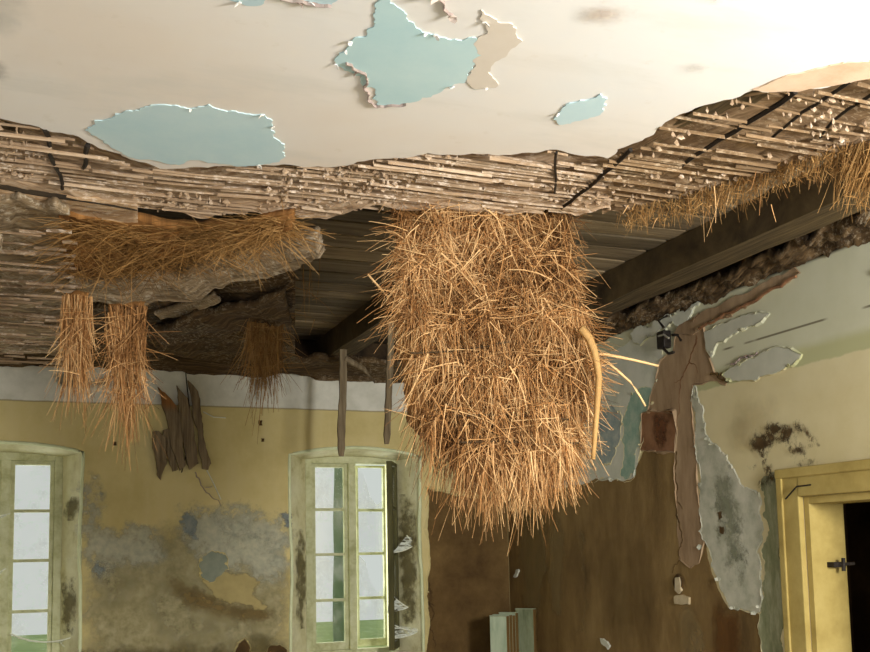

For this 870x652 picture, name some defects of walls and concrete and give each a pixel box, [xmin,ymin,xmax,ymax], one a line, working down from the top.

crack [280,0,332,8]
crack [430,0,457,24]
peeling [333,0,523,106]
peeling [753,60,870,92]
peeling [85,104,285,170]
peeling [554,93,607,125]
flaking render [423,267,803,652]
damp [750,423,819,487]
damp [715,478,740,563]
peeling [198,550,229,584]